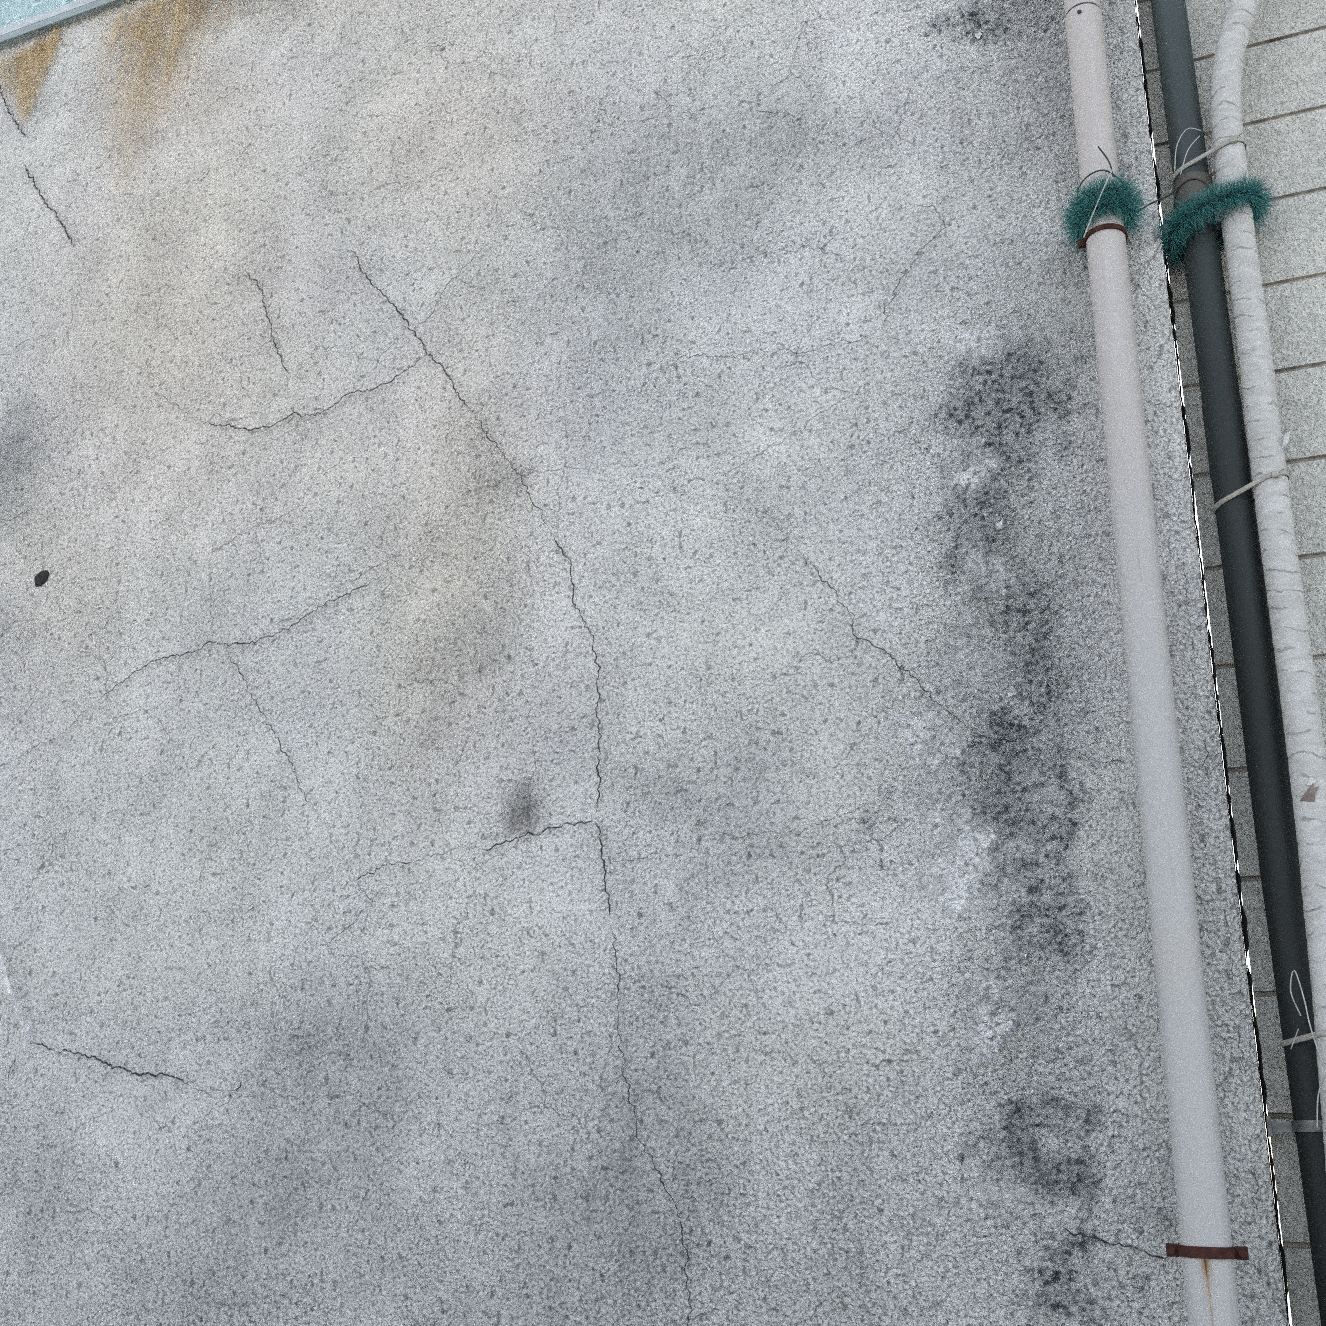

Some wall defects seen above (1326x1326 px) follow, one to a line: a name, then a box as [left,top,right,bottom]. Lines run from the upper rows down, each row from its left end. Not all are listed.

crack [0,85,74,246]
leakage [934,347,1071,706]
crack [0,577,380,805]
crack [158,248,692,1326]
leakage [958,711,1085,957]
crack [8,1043,242,1094]
leakage [981,1099,1098,1200]
leakage [1029,1232,1101,1326]